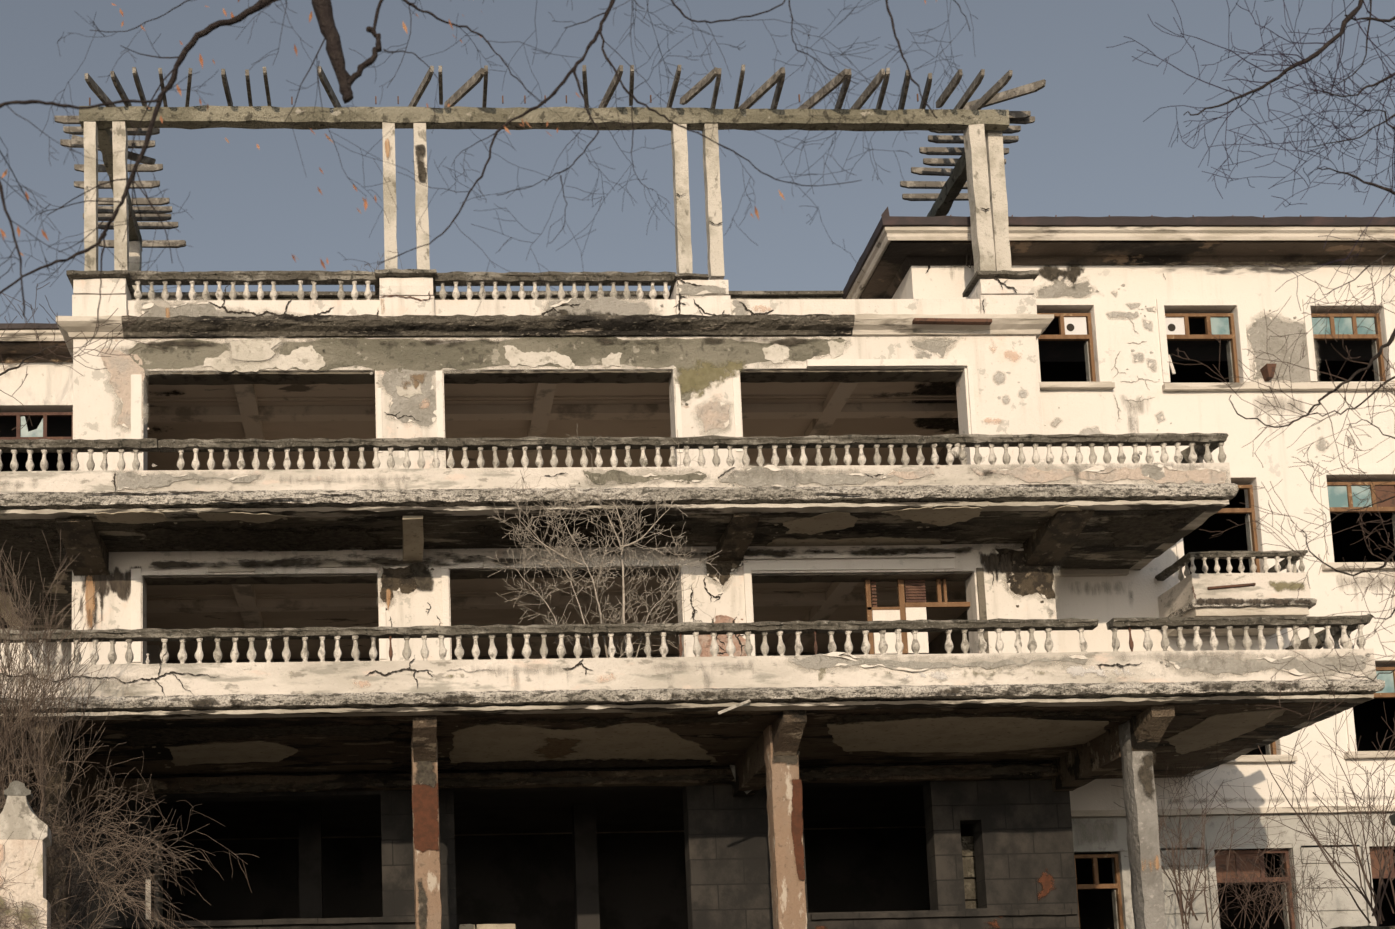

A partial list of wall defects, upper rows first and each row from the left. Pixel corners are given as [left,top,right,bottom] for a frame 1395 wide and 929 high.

flaking render [1037,279,1166,331]
flaking render [1246,310,1317,383]
flaking render [100,336,847,435]
peeling [765,504,990,547]
spalling [993,545,1058,617]
crack [0,647,218,695]
crack [365,655,497,688]
corrosion [412,783,439,852]
corrosion [791,779,805,880]